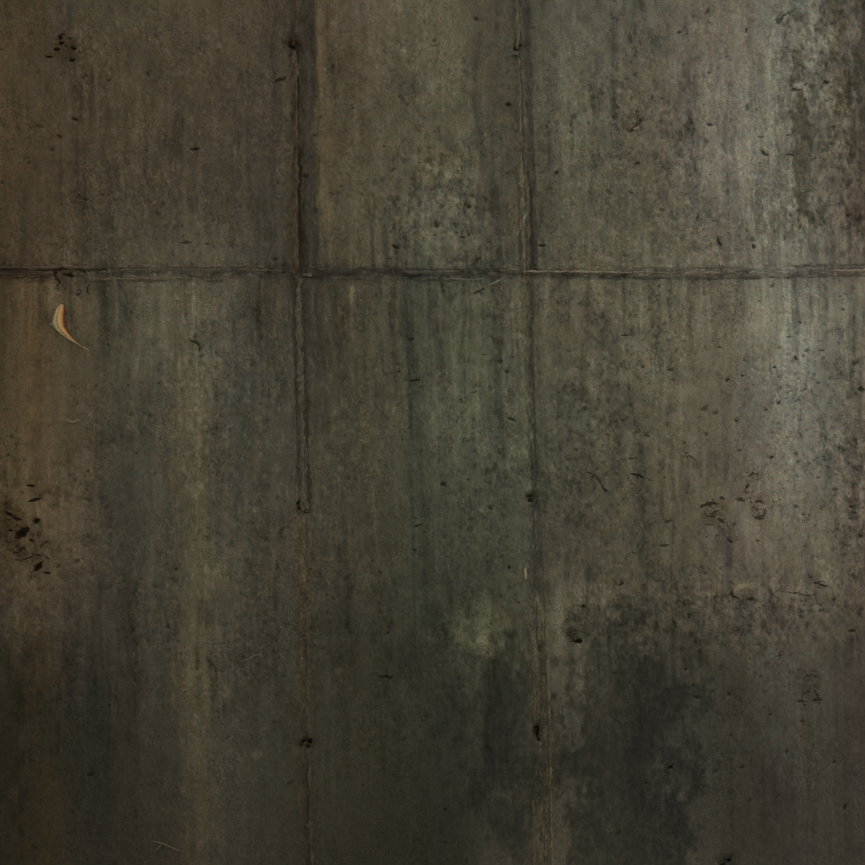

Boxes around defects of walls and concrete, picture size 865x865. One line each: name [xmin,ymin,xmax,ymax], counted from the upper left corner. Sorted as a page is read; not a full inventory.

water stain [728,0,828,267]
water stain [540,281,865,865]